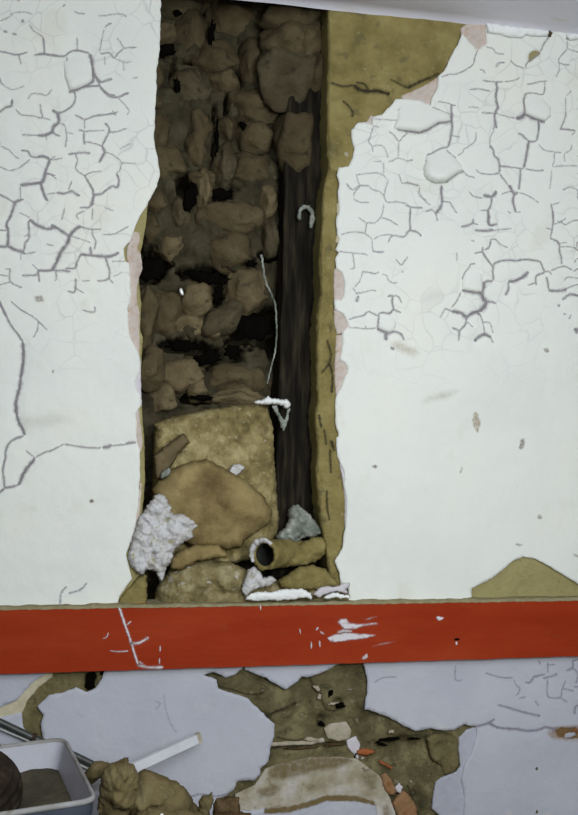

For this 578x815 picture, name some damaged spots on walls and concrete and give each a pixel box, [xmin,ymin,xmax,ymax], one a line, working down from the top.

crack [0,5,137,492]
flaking render [245,10,486,602]
crack [331,36,578,350]
flaking render [118,204,148,601]
flaking render [229,463,245,475]
flaking render [471,557,578,598]
flaking render [0,671,104,738]
flaking render [205,663,476,815]
crack [476,659,578,732]